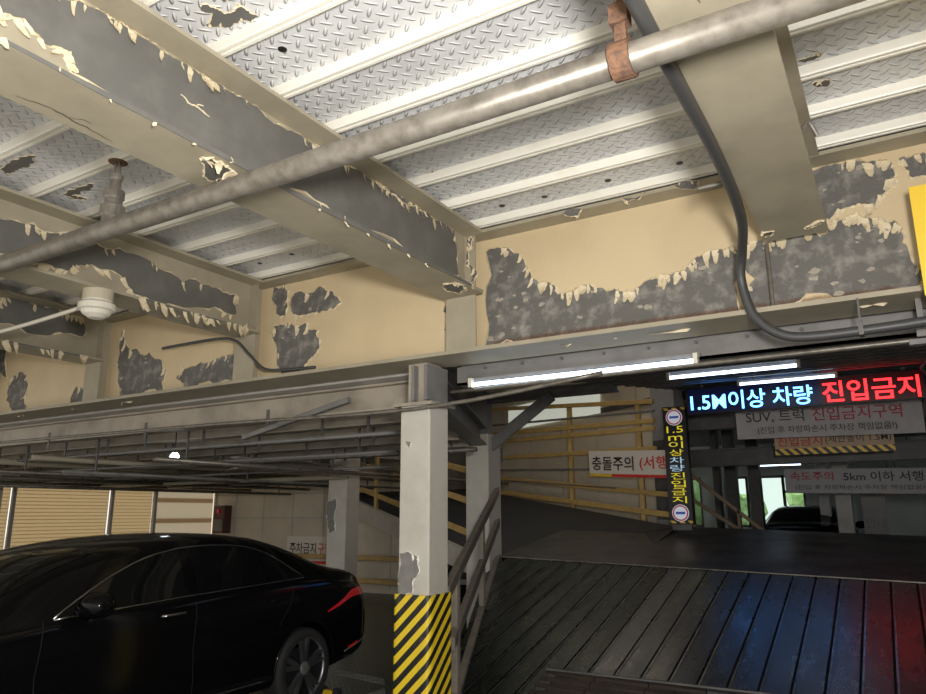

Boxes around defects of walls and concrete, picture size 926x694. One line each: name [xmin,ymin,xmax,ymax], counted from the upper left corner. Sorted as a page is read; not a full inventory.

peeling [0,0,320,183]
peeling [0,219,68,255]
peeling [0,297,89,420]
peeling [62,183,94,201]
peeling [31,243,249,337]
peeling [116,327,234,405]
peeling [270,285,343,374]
peeling [278,152,926,347]